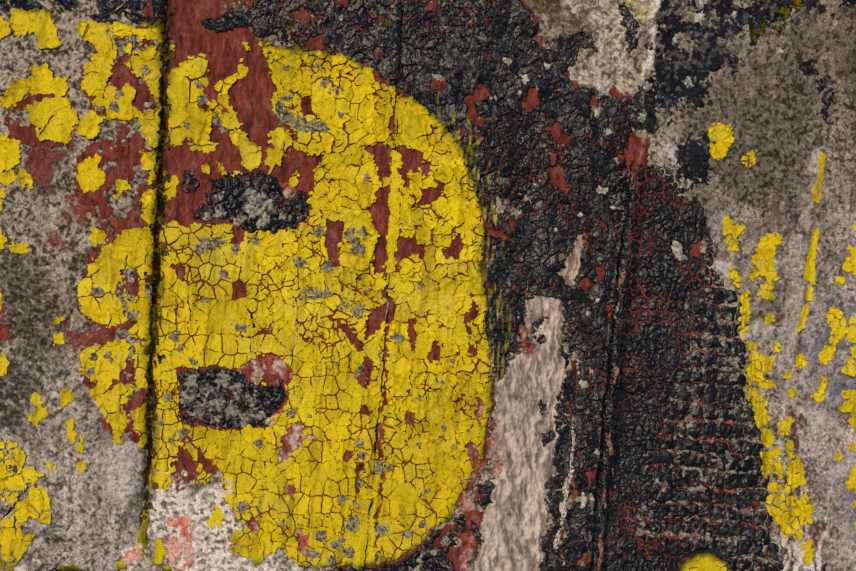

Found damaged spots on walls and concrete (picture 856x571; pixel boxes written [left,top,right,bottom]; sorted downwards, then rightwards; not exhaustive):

crack [396,1,404,96]
spalling [0,0,164,454]
crack [144,0,170,510]
crack [244,306,256,328]
crack [373,273,389,475]
peeling [116,0,795,571]
crack [588,164,633,571]
peeling [797,229,819,333]
peeling [818,306,856,377]
peeling [0,440,56,571]
crack [363,499,373,571]
peeling [759,447,816,571]